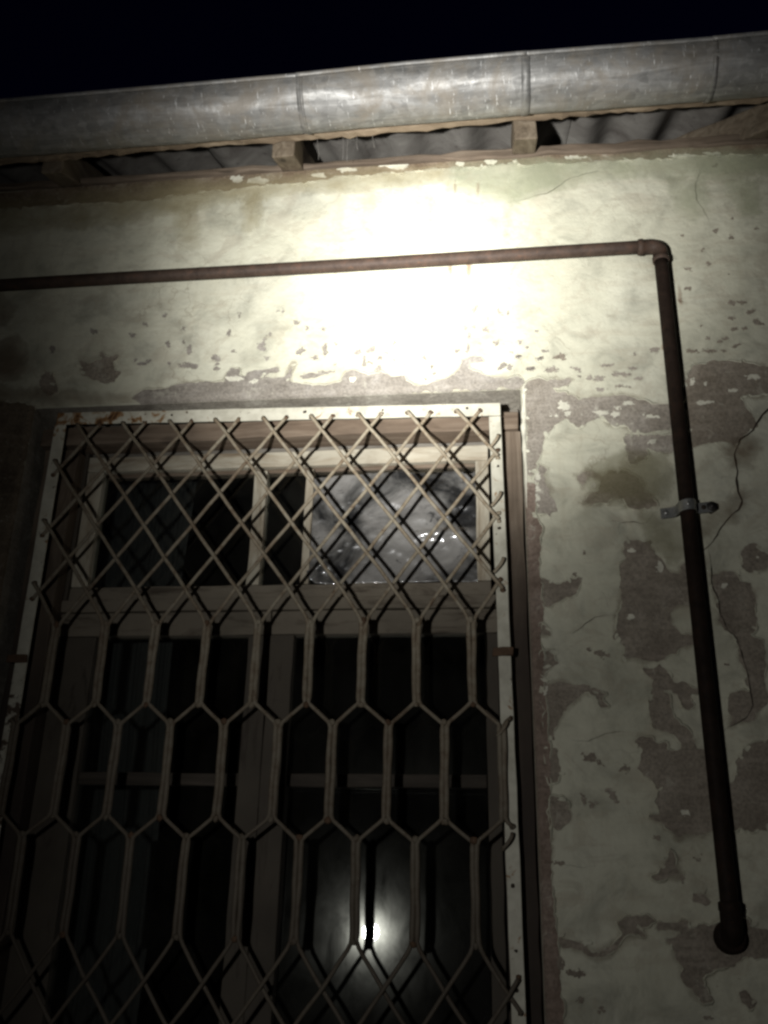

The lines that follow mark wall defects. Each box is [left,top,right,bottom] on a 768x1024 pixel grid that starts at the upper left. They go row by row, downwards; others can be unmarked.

peeling [132,299,768,1024]
crack [702,409,768,729]